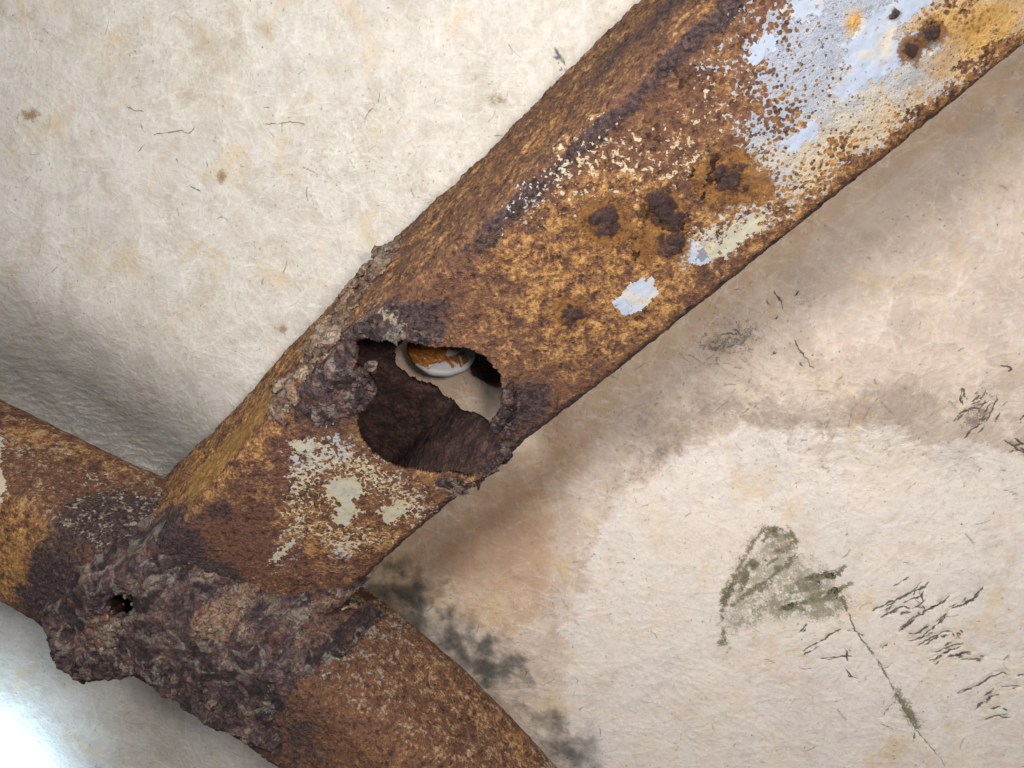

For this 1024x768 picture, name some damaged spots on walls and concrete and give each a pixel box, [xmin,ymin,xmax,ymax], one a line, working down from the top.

peeling [743,31,782,66]
peeling [827,0,950,103]
rust [897,15,952,68]
peeling [779,119,820,155]
rust [567,145,781,268]
peeling [686,212,767,266]
rust [265,233,404,428]
peeling [321,475,414,528]
rust [189,582,260,644]
leakage [717,526,852,646]
rust [50,614,265,727]
leakage [561,743,582,761]